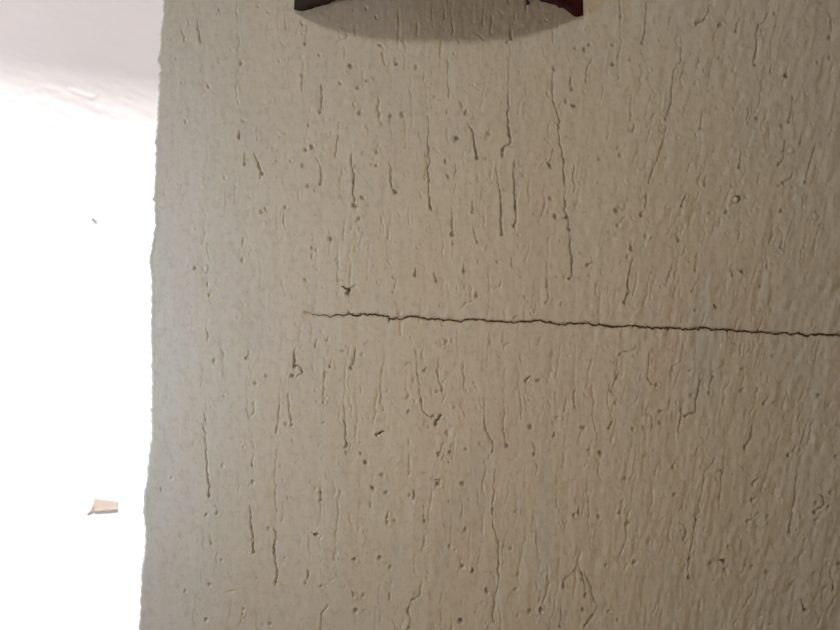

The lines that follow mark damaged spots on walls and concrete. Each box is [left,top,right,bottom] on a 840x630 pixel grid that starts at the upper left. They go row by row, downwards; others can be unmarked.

crack [309,311,840,337]